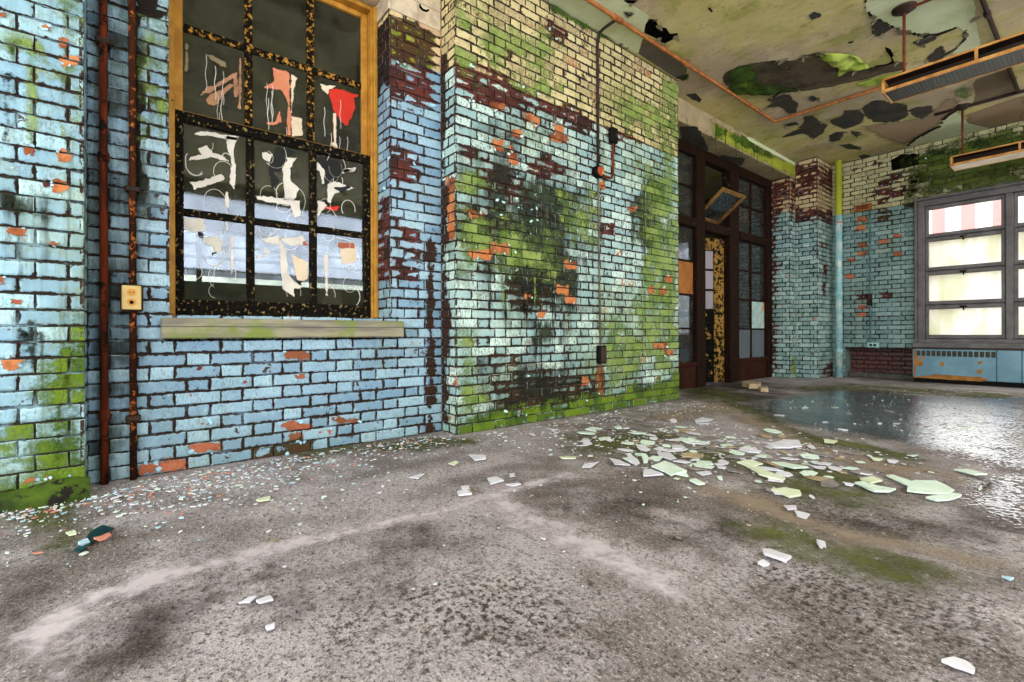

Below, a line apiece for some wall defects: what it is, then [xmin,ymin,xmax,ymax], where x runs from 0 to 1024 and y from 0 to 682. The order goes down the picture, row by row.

flaking render [865,0,981,64]
flaking render [973,69,1017,103]
leakage [630,178,665,260]
peeling [0,0,988,559]
leakage [459,138,595,412]
leakage [18,320,63,470]
leakage [60,347,71,372]
rust [914,349,988,382]